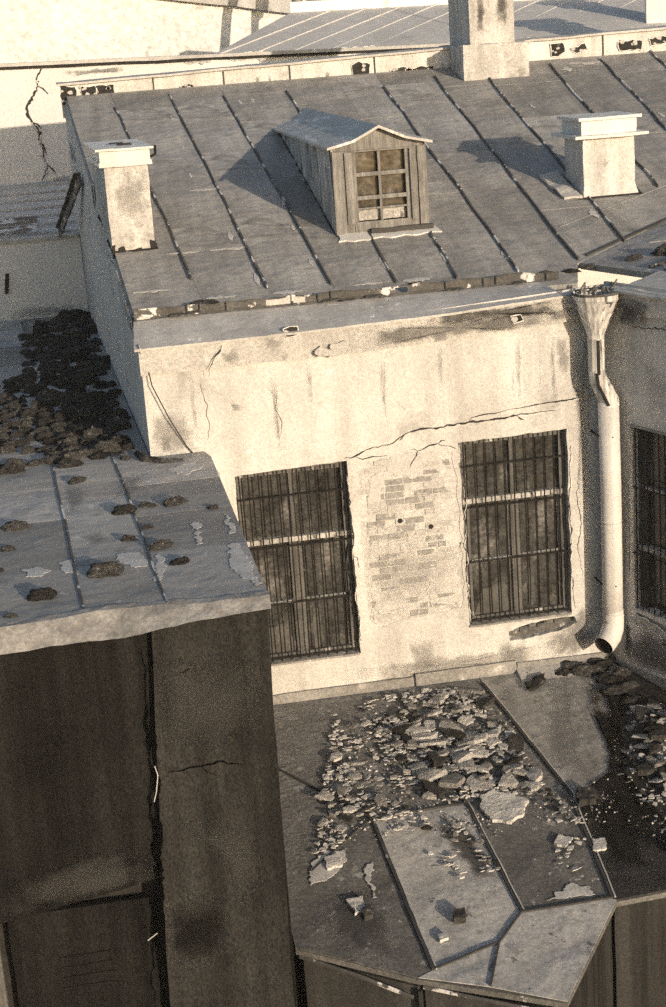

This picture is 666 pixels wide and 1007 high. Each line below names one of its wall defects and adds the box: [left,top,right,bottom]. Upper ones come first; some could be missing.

crack [25,68,84,184]
crack [621,323,666,331]
crack [200,346,222,438]
flaking render [357,451,465,627]
crack [343,395,592,640]